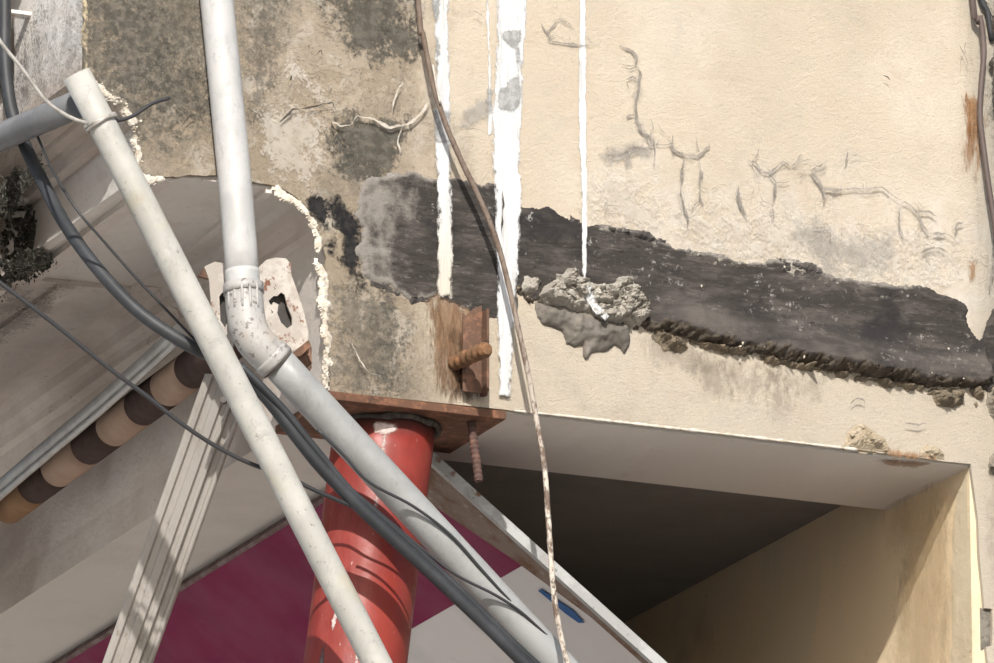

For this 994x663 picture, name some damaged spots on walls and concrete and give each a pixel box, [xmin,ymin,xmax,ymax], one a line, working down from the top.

crack [262,102,352,151]
water stain [305,193,365,294]
water stain [316,0,454,299]
peeling [354,171,500,318]
water stain [463,0,527,396]
peeling [514,207,994,421]
crack [541,18,994,287]
rust [965,94,981,163]
spalling [843,424,890,455]
spalling [918,444,944,462]